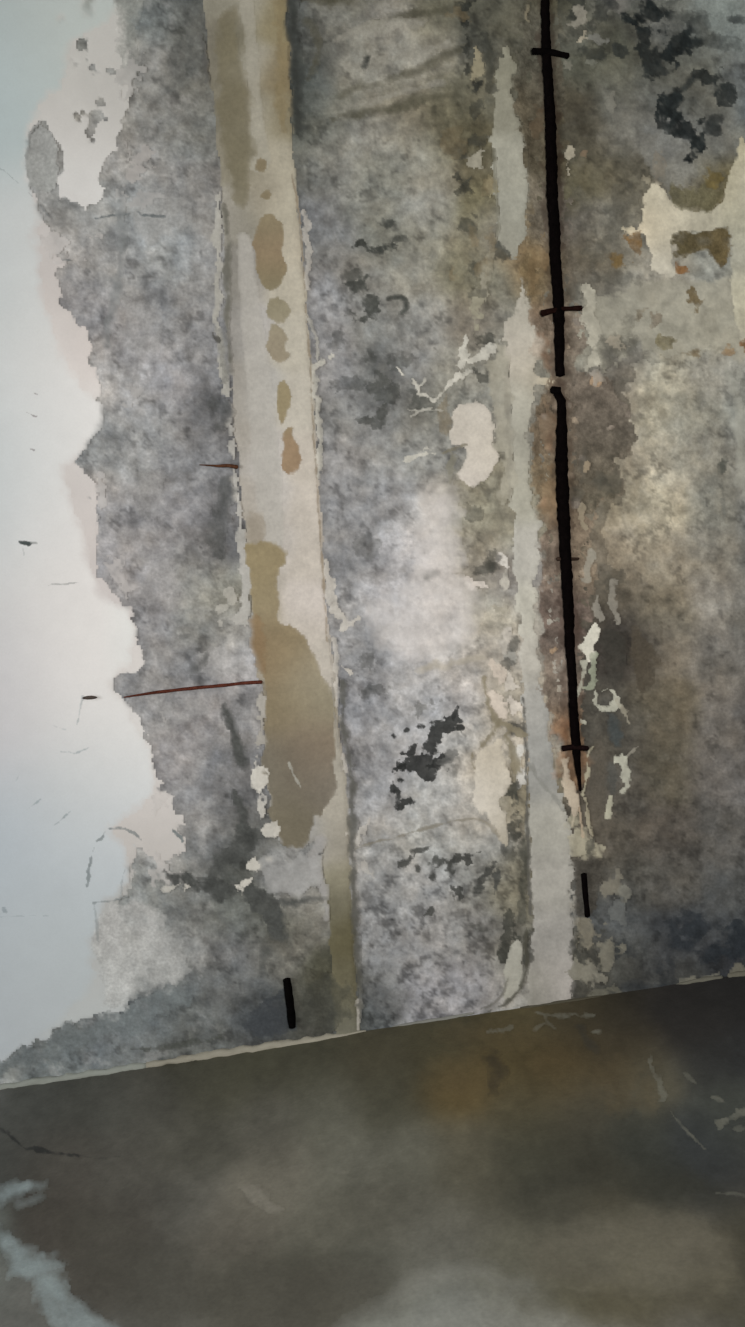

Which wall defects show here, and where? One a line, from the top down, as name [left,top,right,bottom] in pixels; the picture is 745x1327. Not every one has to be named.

damp [213,0,501,479]
damp [563,0,745,300]
rust [522,0,593,800]
peeling [449,0,745,754]
damp [589,313,640,440]
peeling [0,0,258,1061]
damp [239,971,361,1039]
damp [397,779,535,975]
peeling [472,739,513,847]
peeling [503,939,523,1003]
damp [613,908,745,1086]
damp [0,1159,745,1327]